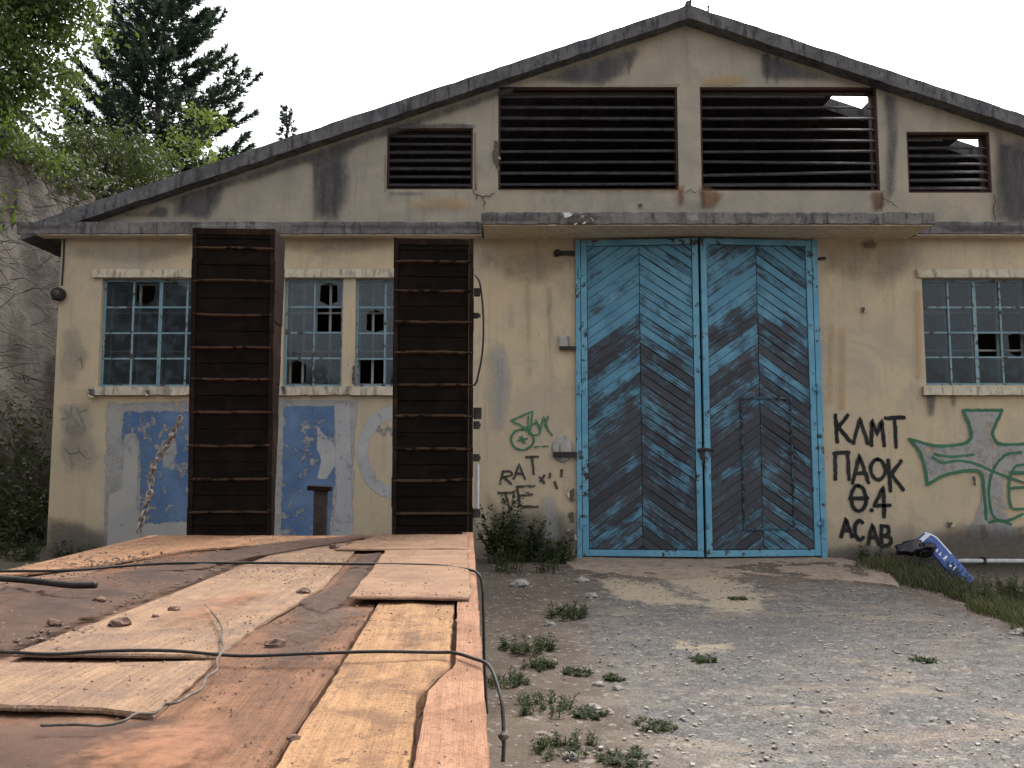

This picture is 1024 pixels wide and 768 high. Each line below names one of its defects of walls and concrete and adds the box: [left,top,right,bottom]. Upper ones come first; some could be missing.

leakage [762,54,817,78]
leakage [148,90,509,226]
crack [473,191,495,231]
leakage [944,141,1024,231]